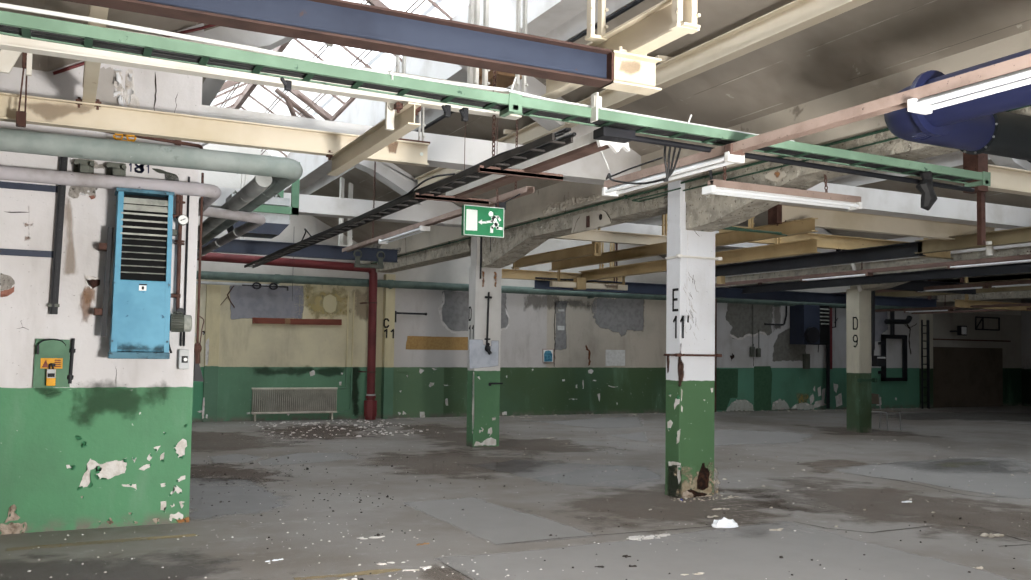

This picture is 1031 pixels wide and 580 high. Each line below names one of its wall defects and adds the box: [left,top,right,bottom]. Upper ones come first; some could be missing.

peeling [95,67,140,109]
rust [667,344,684,387]
peeling [472,372,507,446]
peeling [667,389,683,443]
peeling [726,399,754,412]
spalling [0,504,27,535]
peeling [66,424,188,499]
peeling [153,476,185,524]
peeling [668,461,711,498]
rust [687,463,710,497]